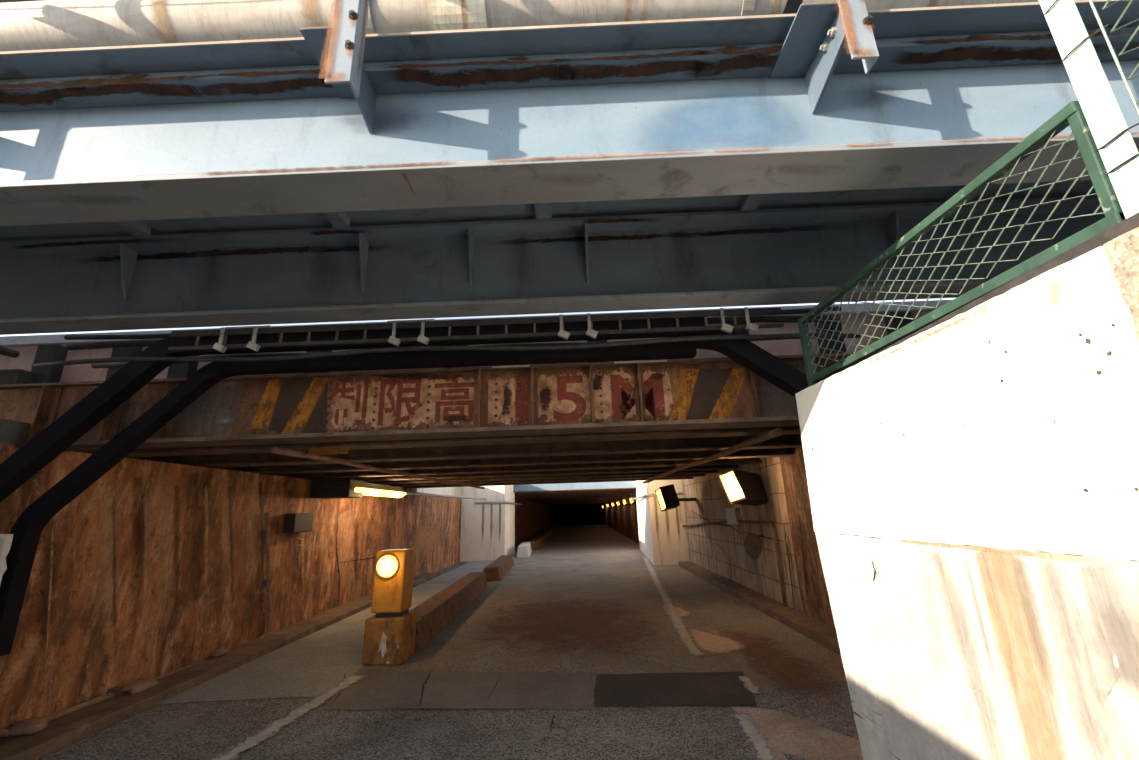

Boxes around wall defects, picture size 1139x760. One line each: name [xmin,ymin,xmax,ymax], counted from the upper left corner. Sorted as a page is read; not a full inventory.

corrosion [0,0,368,106]
corrosion [392,45,782,88]
corrosion [803,0,870,56]
corrosion [898,34,1062,64]